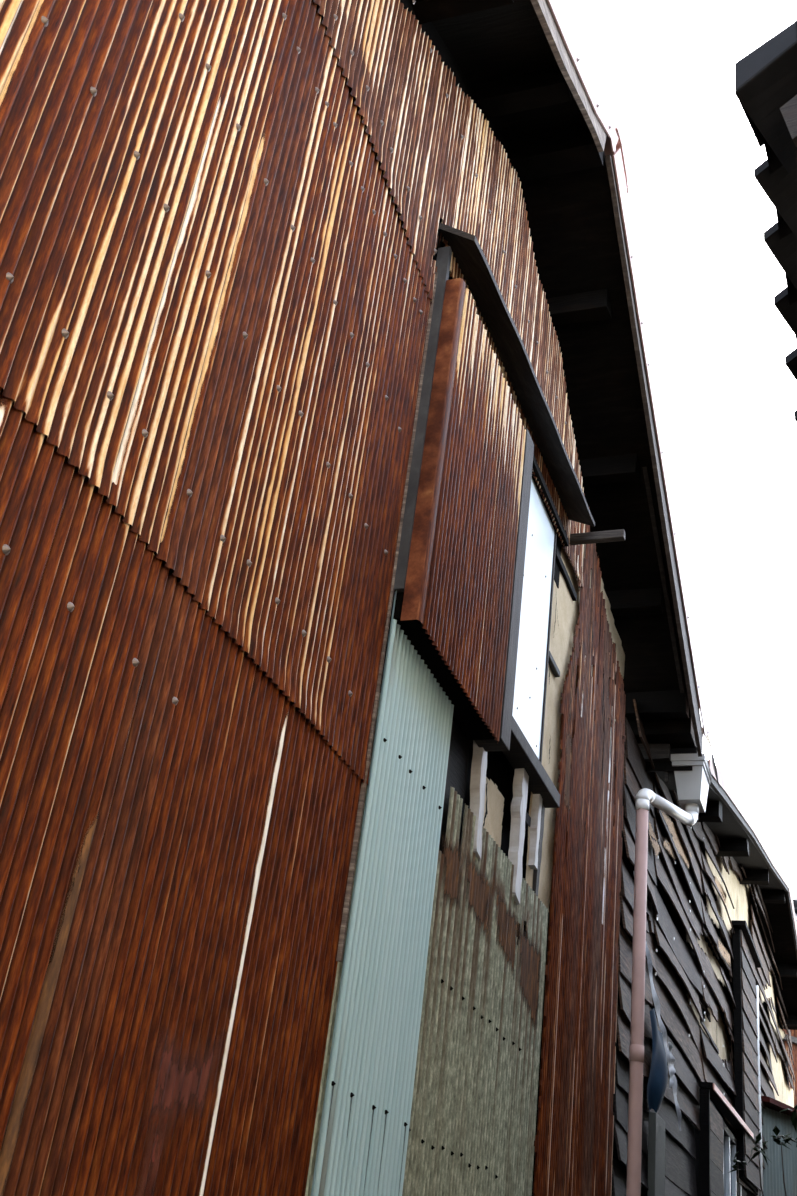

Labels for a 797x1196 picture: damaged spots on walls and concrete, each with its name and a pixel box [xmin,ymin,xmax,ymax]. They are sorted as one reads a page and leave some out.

flaking render [542,547,625,791]
flaking render [525,792,556,912]
flaking render [685,844,752,988]
flaking render [686,993,730,1062]
flaking render [759,955,794,1108]